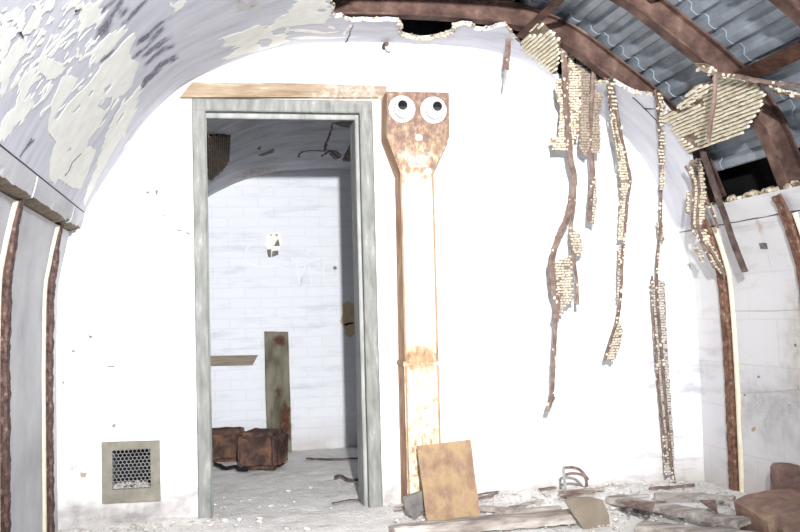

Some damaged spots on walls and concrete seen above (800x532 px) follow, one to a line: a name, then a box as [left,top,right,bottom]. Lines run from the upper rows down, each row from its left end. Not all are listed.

peeling [220,0,528,60]
peeling [0,0,144,206]
spalling [590,78,654,96]